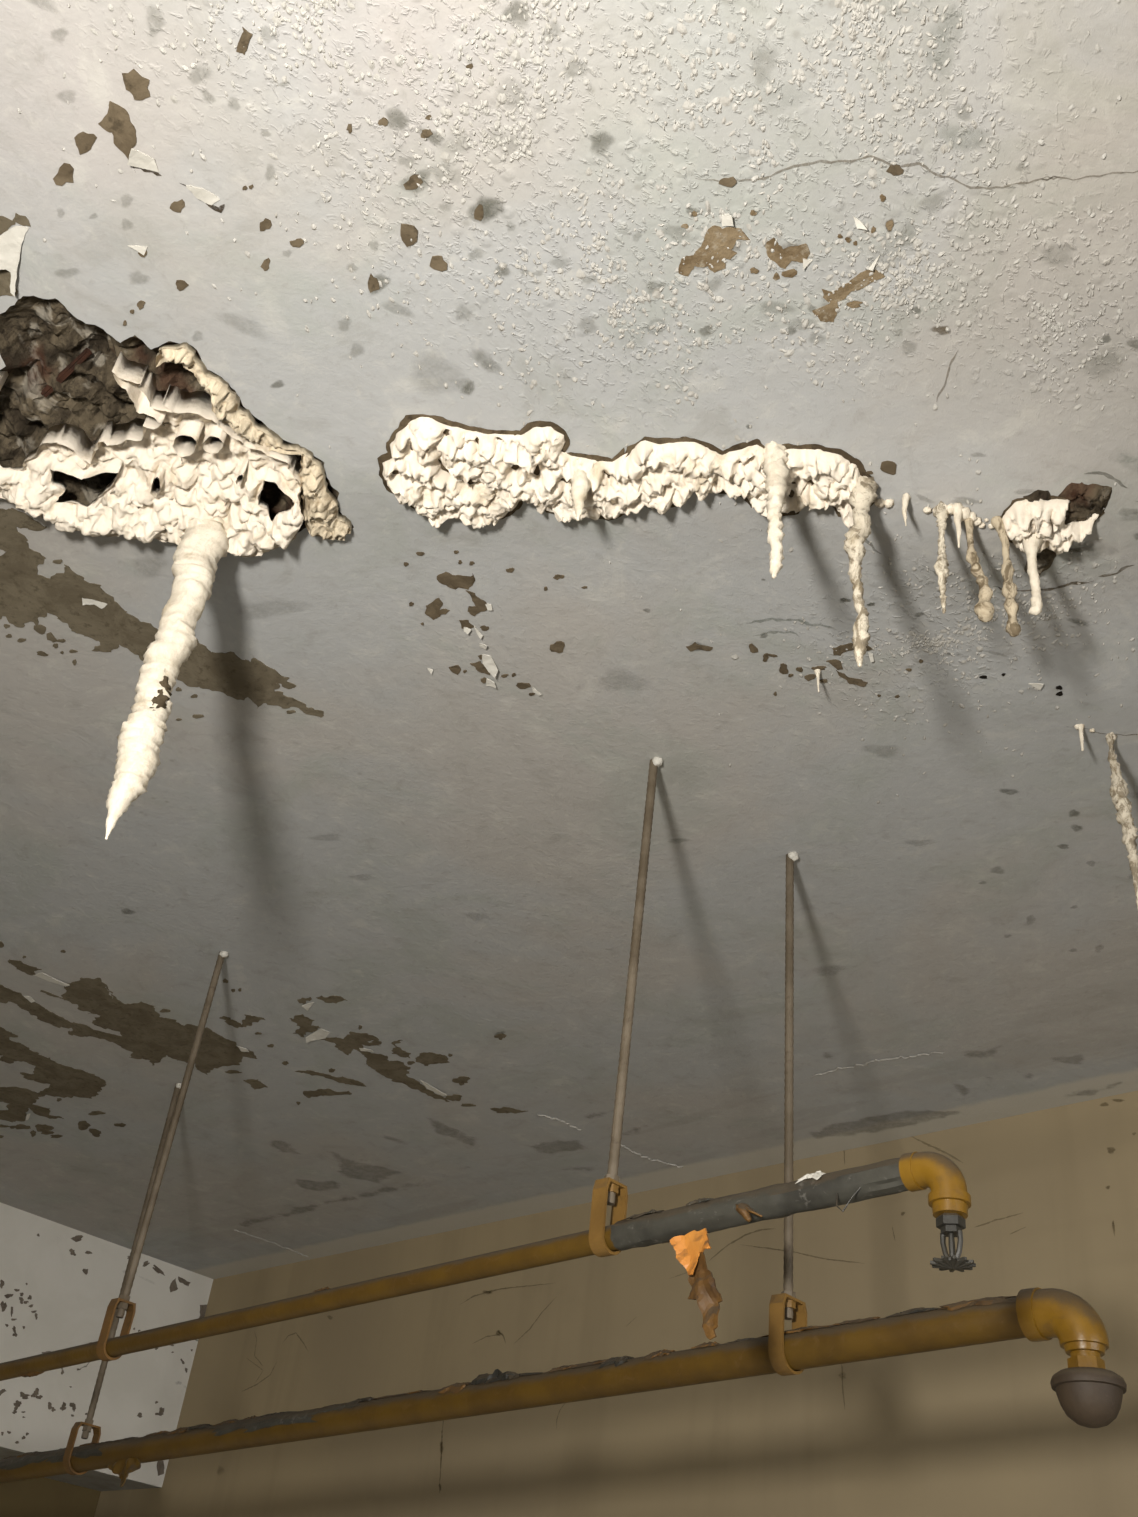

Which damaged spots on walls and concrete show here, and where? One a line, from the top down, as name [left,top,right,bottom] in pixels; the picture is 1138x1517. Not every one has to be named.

peeling [236,27,253,55]
peeling [53,69,161,186]
peeling [170,183,225,213]
peeling [400,223,418,247]
peeling [430,255,447,272]
crack [695,155,1138,189]
spalling [0,213,354,541]
peeling [0,508,158,665]
damp [0,352,304,840]
damp [377,414,1133,667]
peeling [176,638,324,721]
peeling [0,1368,164,1487]